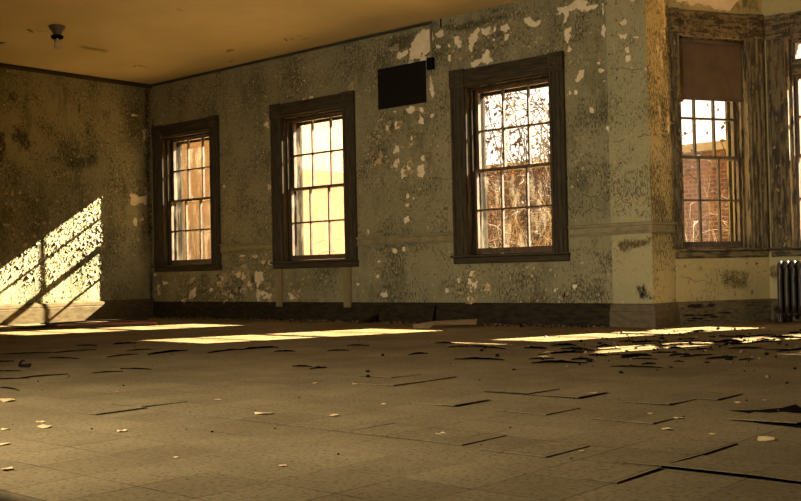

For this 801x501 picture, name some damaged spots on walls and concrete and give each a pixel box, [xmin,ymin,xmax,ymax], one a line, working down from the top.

peeling [389,24,512,68]
peeling [524,16,541,27]
peeling [555,0,639,62]
peeling [644,0,740,90]
peeling [567,70,584,96]
peeling [370,106,434,223]
peeling [653,102,674,186]
leakage [619,237,651,252]
peeling [153,251,273,303]
peeling [283,288,302,302]
peeling [445,266,493,304]